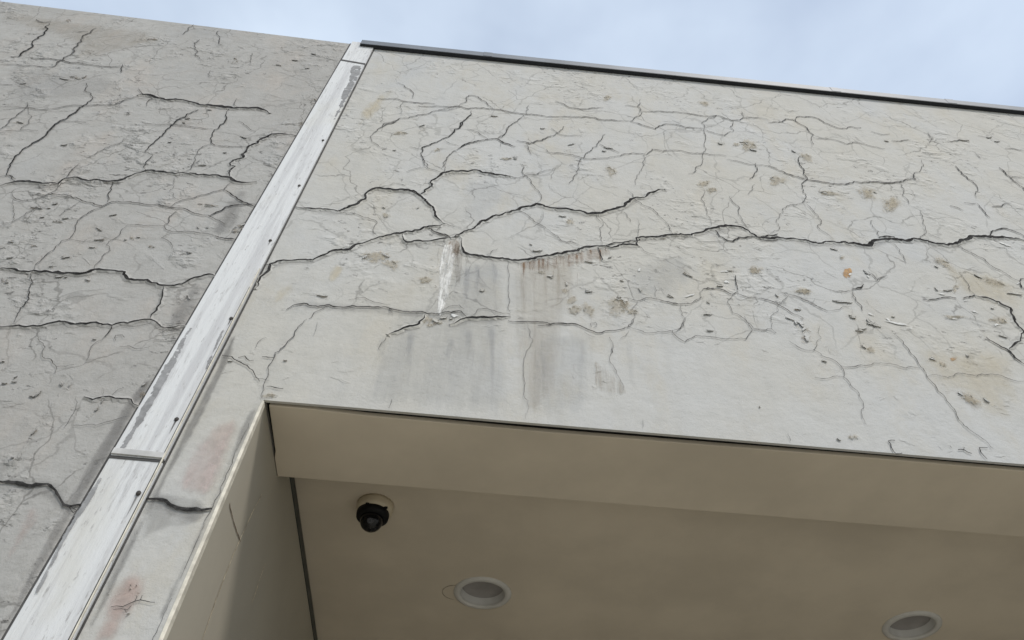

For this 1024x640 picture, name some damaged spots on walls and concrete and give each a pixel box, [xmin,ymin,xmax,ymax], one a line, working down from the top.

crack [0,19,295,368]
water stain [438,244,455,315]
crack [223,83,1024,459]
peeling [529,237,851,332]
crack [65,387,140,426]
crack [0,480,82,513]
crack [147,494,262,640]